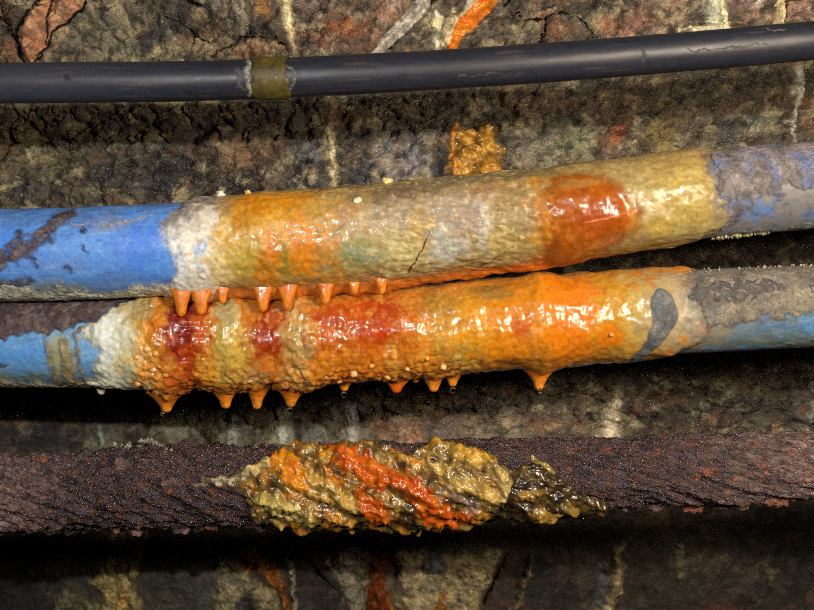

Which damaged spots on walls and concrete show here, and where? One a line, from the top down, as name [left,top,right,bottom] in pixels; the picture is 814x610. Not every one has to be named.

leakage [372,0,431,53]
corrosion [444,122,505,176]
corrosion [365,536,394,610]